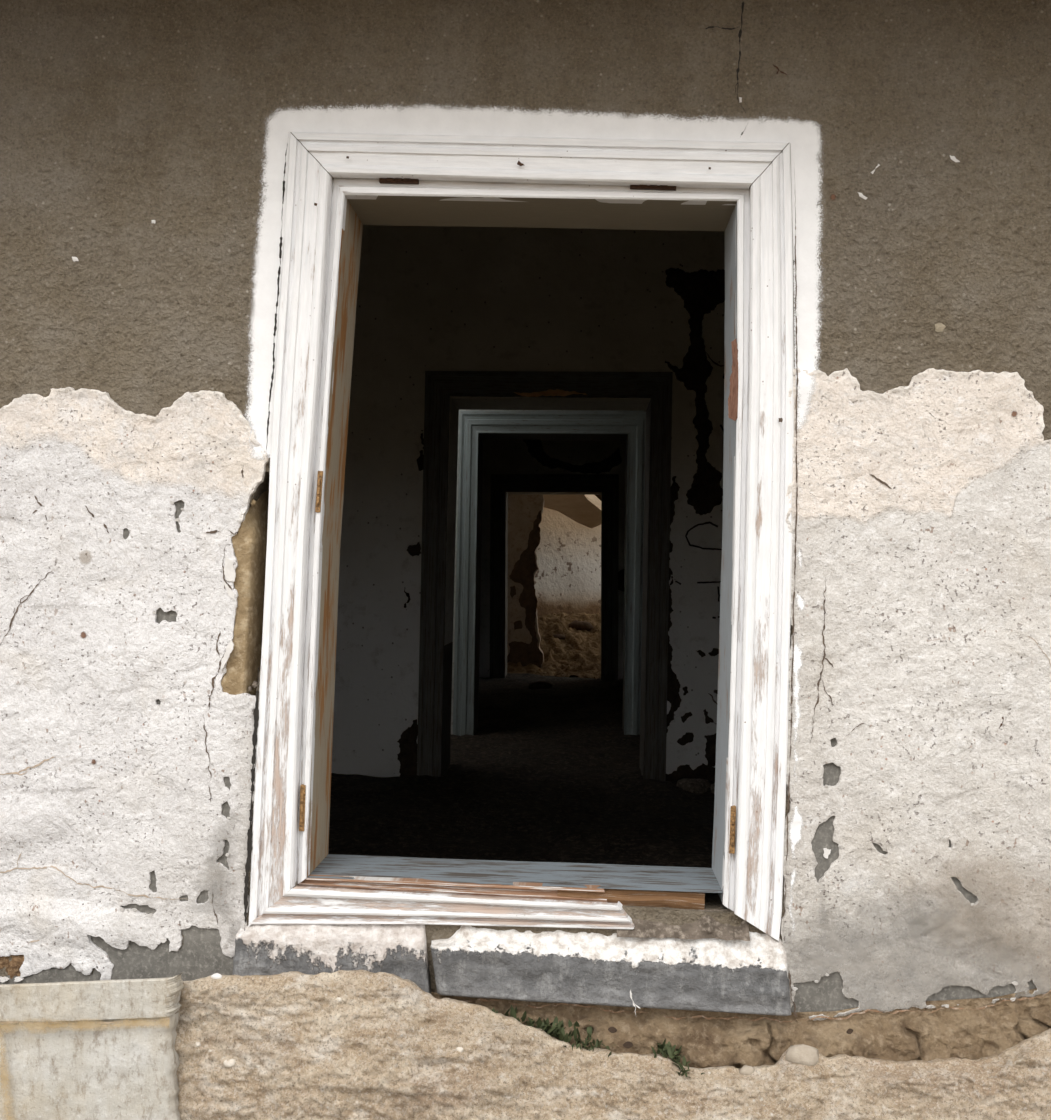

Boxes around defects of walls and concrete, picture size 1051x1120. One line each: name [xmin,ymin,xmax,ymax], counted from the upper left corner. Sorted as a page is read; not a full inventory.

crack [705,2,746,135]
peeling [170,500,185,533]
peeling [665,268,725,781]
crack [783,176,834,933]
crack [4,571,52,637]
peeling [153,608,177,624]
spalling [220,490,269,695]
peeling [222,777,231,819]
peeling [823,763,841,787]
peeling [811,816,842,882]
peeling [120,904,157,917]
peeling [0,926,234,984]